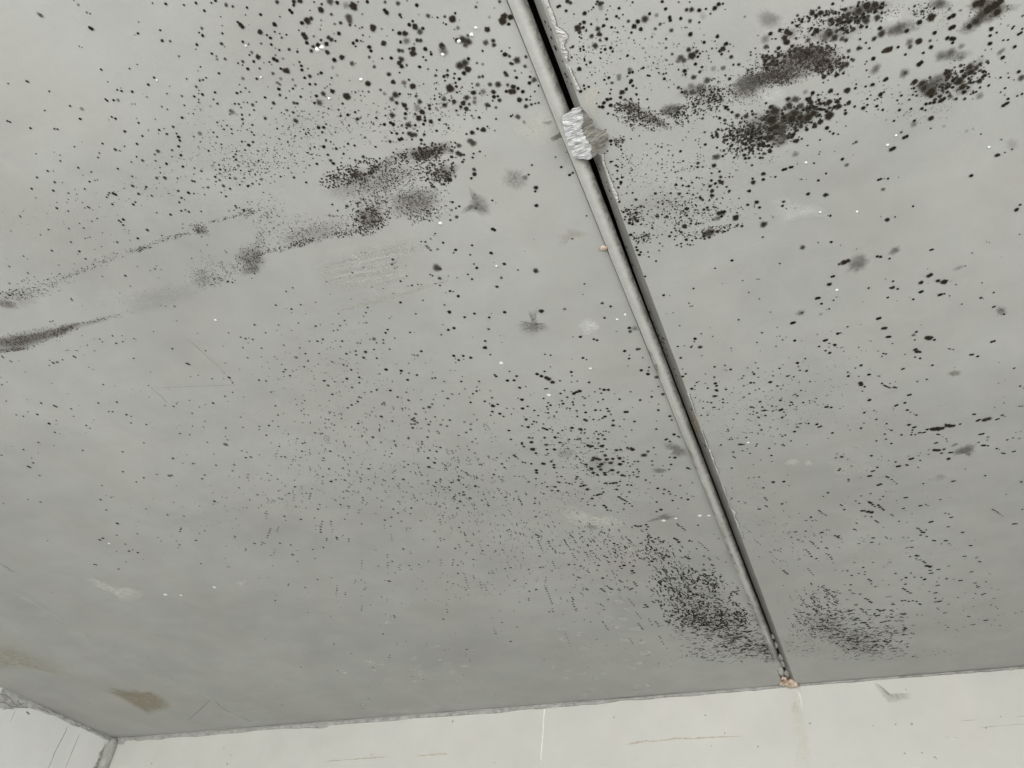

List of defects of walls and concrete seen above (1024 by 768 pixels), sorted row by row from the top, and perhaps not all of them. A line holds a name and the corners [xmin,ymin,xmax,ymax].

leakage [0,310,133,362]
leakage [0,0,540,306]
leakage [372,244,507,355]
leakage [212,304,772,664]
leakage [544,0,1024,266]
leakage [648,311,1021,659]